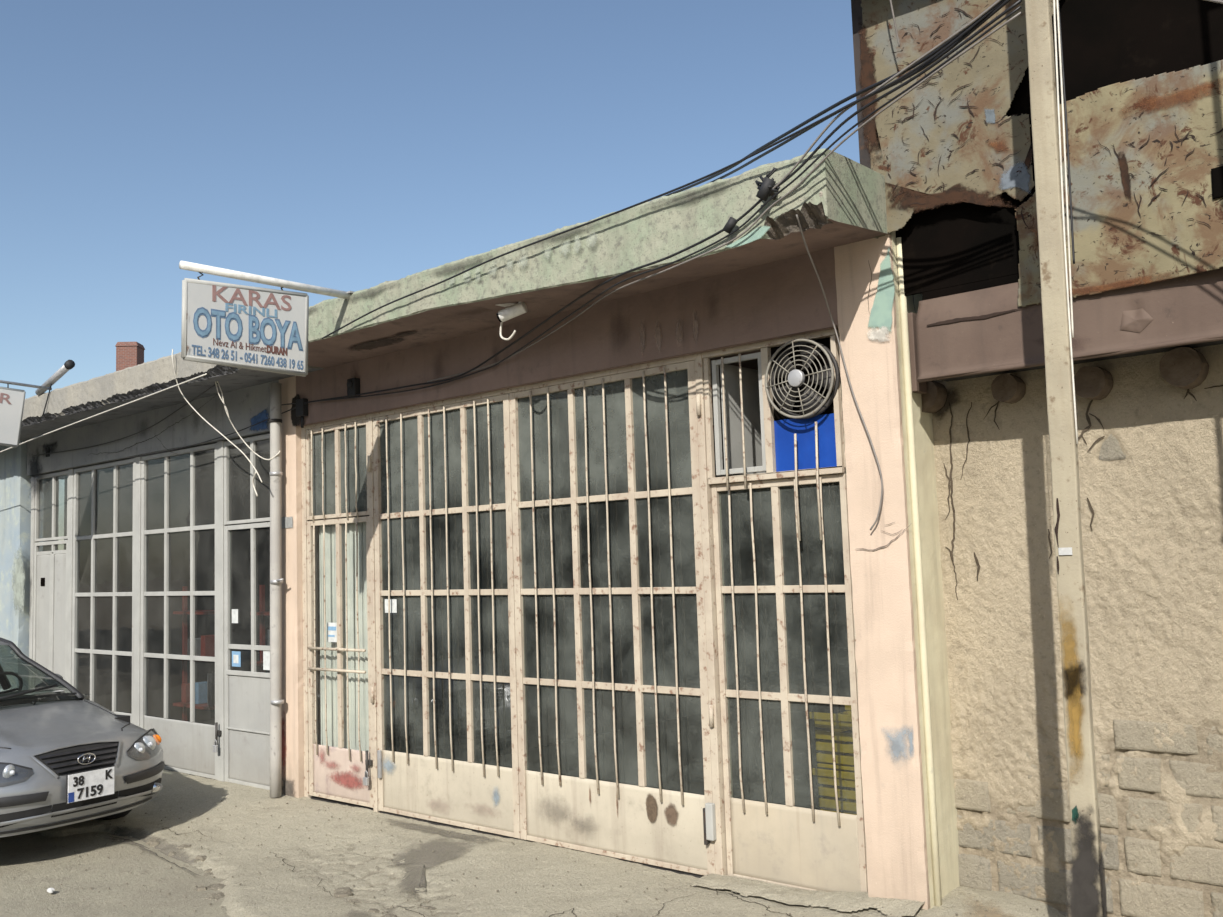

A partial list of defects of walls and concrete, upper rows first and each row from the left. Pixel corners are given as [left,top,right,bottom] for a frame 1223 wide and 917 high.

corrosion [859,0,1042,307]
corrosion [1057,60,1223,298]
crack [1078,400,1105,452]
crack [1184,385,1223,401]
crack [1048,498,1094,574]
corrosion [1062,622,1083,759]
damp [646,794,678,825]
spalling [954,751,1072,916]
spalling [1098,719,1223,917]